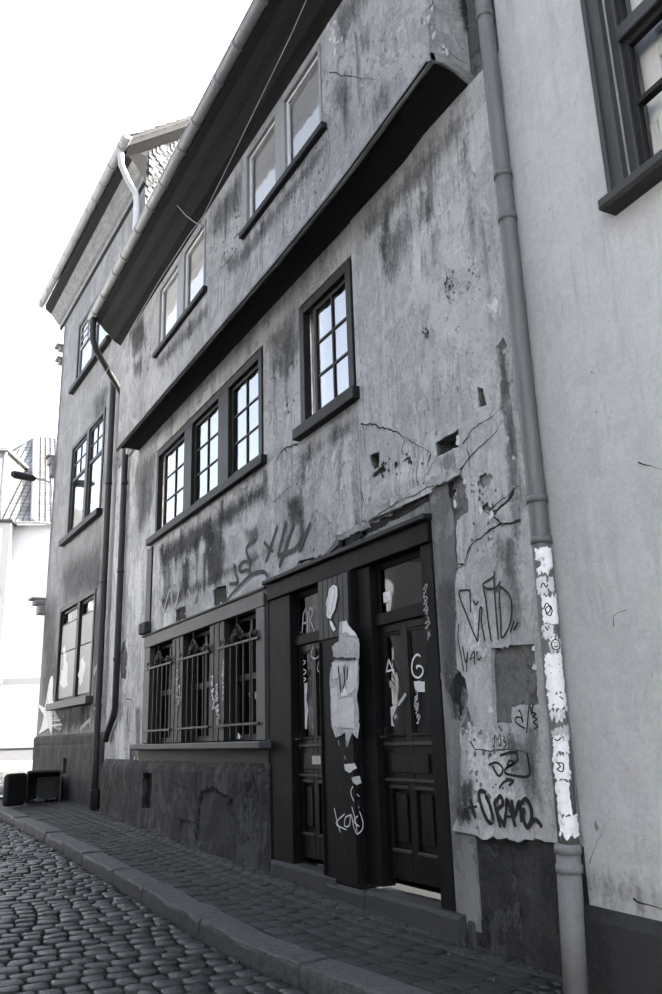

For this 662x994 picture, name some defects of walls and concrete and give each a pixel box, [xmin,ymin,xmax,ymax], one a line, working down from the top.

flaking render [371,453,423,485]
crack [361,423,437,484]
crack [460,406,505,470]
damp [160,480,263,594]
flaking render [453,470,515,553]
crack [454,485,521,571]
damp [226,569,268,601]